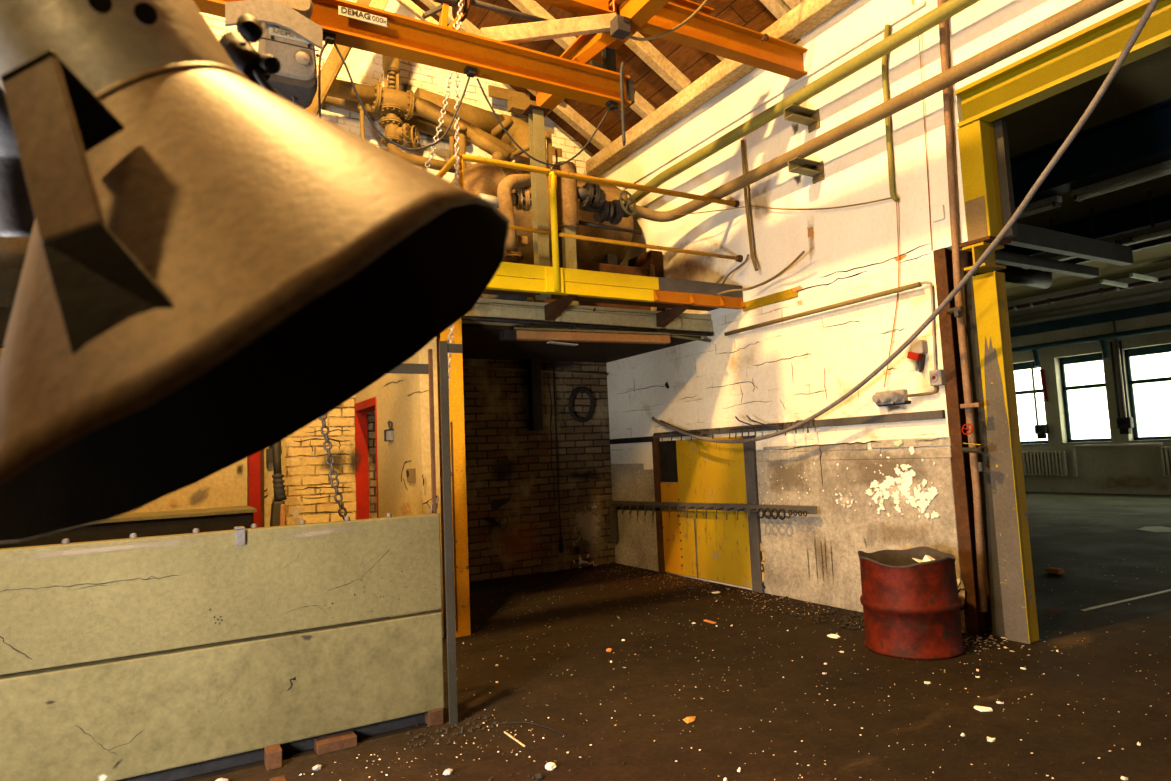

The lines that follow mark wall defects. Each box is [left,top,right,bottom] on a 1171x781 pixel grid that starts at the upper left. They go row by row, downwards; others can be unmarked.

peeling [798,446,940,519]
crack [0,575,179,592]